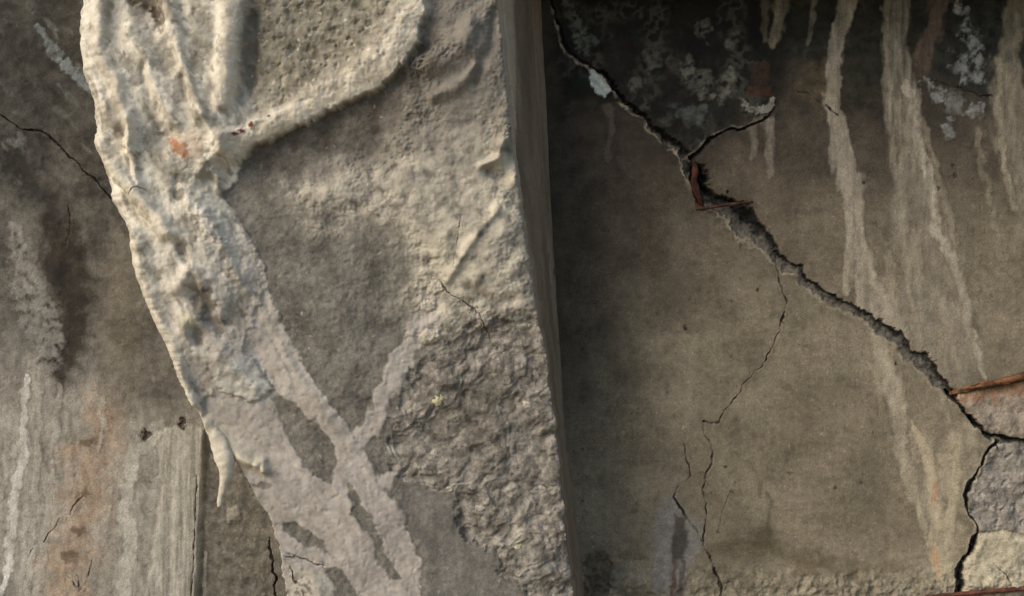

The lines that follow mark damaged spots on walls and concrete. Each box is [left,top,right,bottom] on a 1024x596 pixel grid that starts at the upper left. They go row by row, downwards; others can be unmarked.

crack [0,112,151,206]
damp [258,0,538,367]
damp [542,0,1024,388]
damp [95,429,159,596]
damp [206,348,280,410]
crack [265,533,328,596]
crack [543,0,1024,596]
damp [644,333,986,594]
spalling [648,391,1024,596]
rust [926,586,1024,596]
rust [949,366,1024,416]